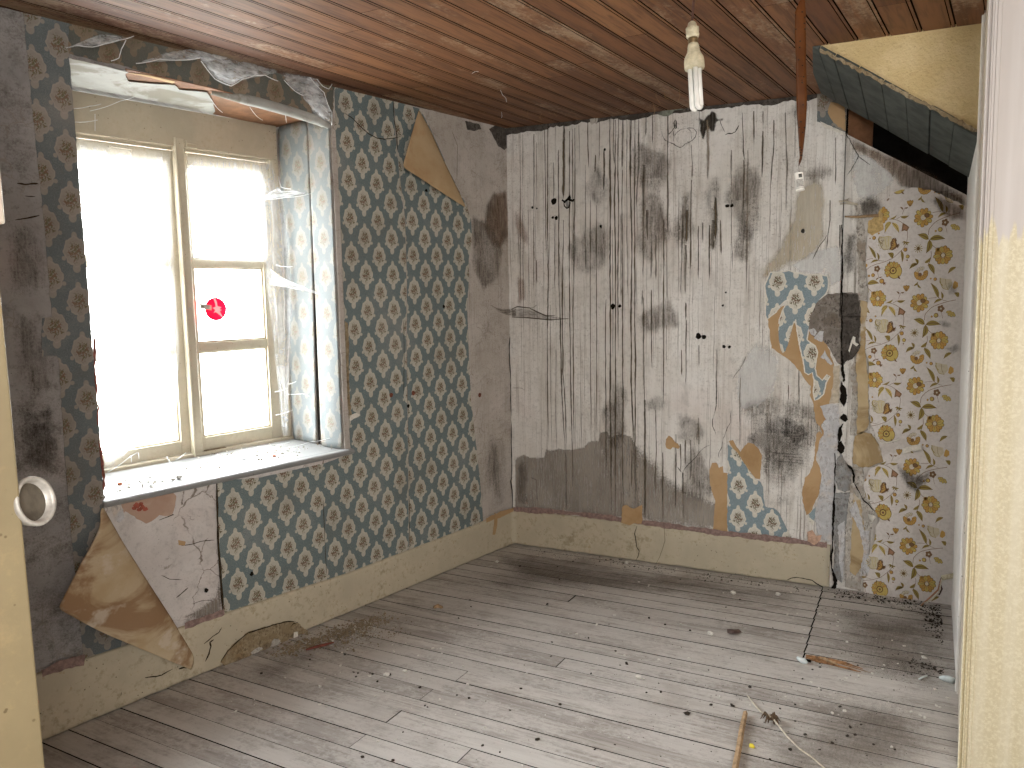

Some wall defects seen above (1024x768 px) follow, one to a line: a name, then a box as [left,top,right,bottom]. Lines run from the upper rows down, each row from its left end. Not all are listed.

leakage [22,411,57,471]
leakage [515,109,854,528]
crack [788,225,874,589]
flaking render [809,198,884,591]
flaking render [221,621,308,666]